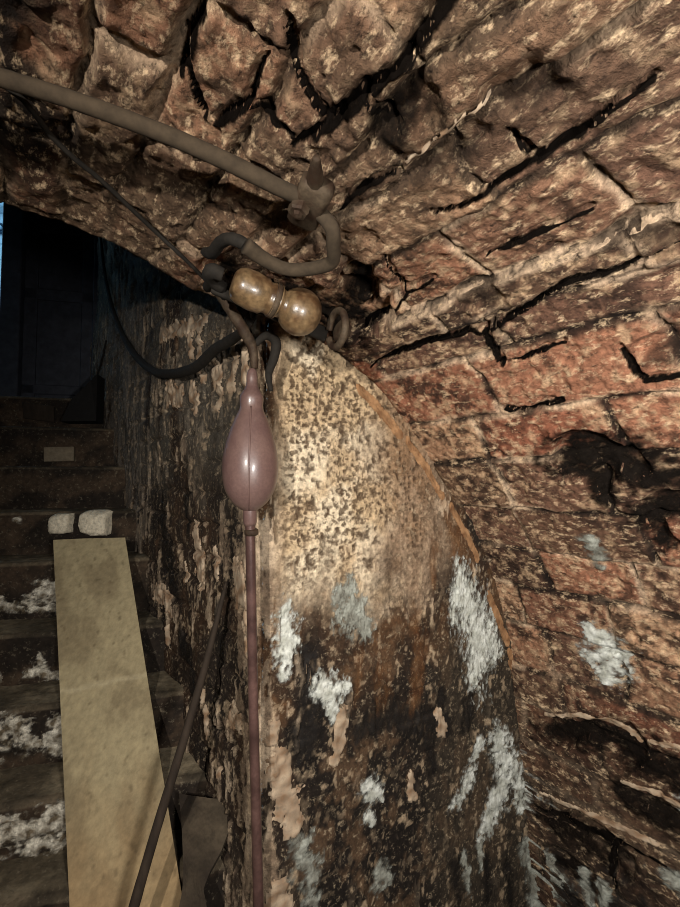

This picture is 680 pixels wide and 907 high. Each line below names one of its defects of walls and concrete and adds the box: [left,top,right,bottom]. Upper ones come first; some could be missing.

damp [158,493,178,599]
damp [331,573,376,642]
damp [178,627,196,697]
damp [271,598,352,764]
damp [580,621,634,685]
damp [352,556,536,907]
damp [519,837,657,907]
damp [661,867,680,897]